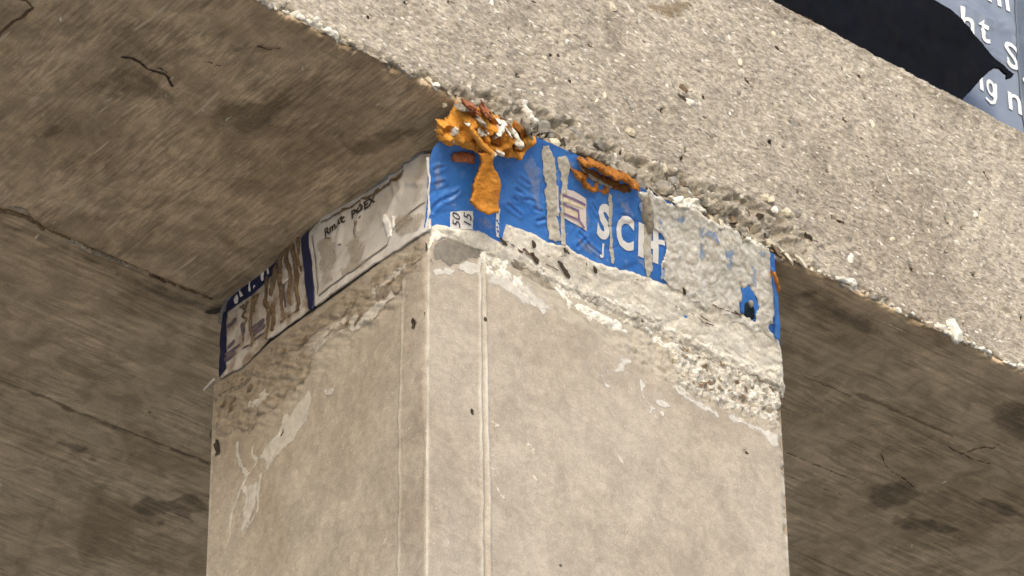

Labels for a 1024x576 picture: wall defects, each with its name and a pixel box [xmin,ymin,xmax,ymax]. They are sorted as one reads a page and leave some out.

crack [121,56,174,87]
spalling [210,224,782,455]
spalling [521,100,1024,369]
crack [948,441,1006,464]